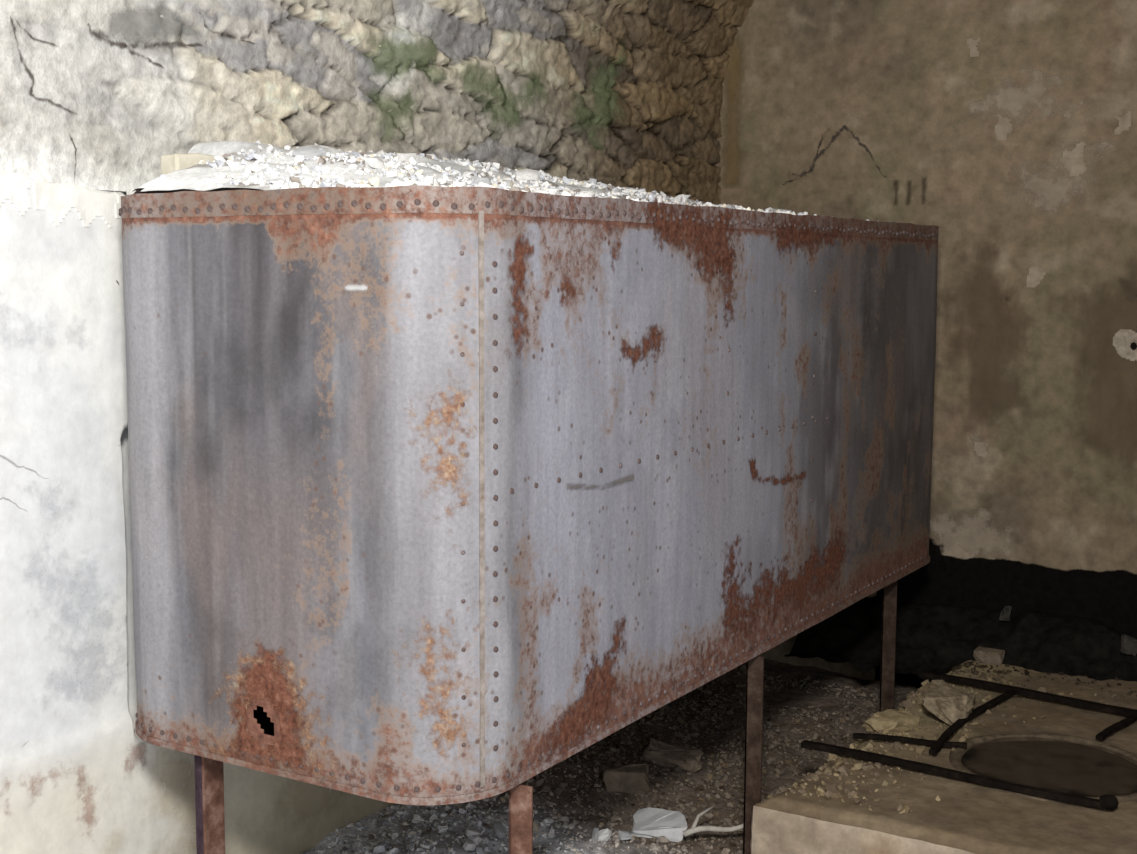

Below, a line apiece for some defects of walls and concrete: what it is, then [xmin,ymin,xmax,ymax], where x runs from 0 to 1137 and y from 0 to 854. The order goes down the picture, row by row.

crack [88,12,255,68]
crack [10,16,77,174]
flaking render [0,0,754,228]
crack [782,126,886,185]
crack [0,455,48,479]